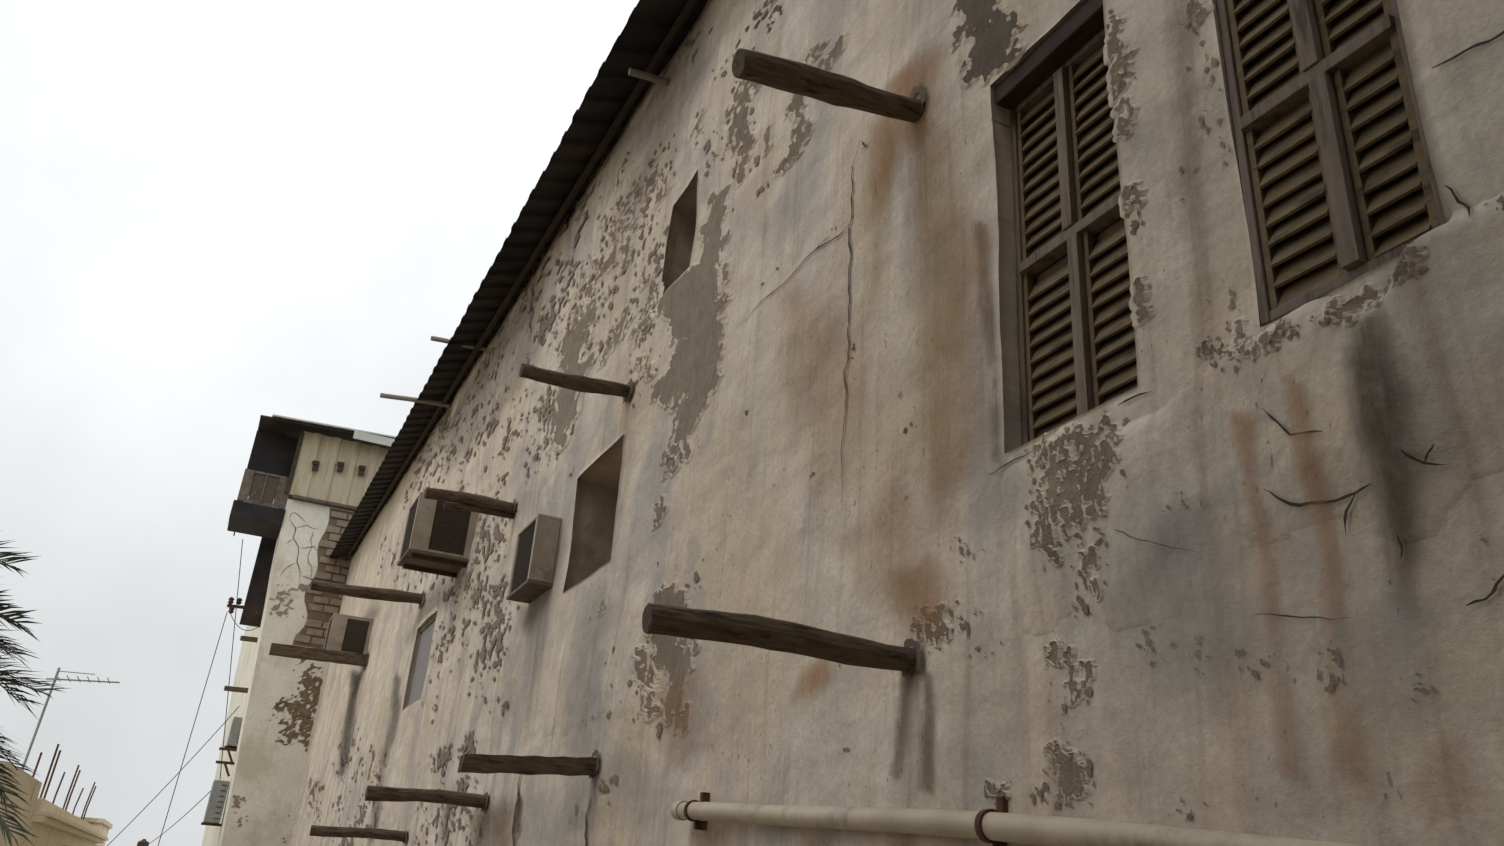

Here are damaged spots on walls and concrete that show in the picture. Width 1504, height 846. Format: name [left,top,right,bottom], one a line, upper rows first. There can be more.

peeling [948,0,1029,90]
peeling [378,0,819,723]
crack [736,141,868,506]
crack [1261,408,1322,436]
crack [1400,443,1446,465]
peeling [1022,410,1131,619]
crack [1264,483,1372,533]
crack [1466,574,1504,606]
peeling [581,633,703,739]
peeling [984,638,1098,809]
peeling [222,795,248,834]
peeling [305,727,386,846]